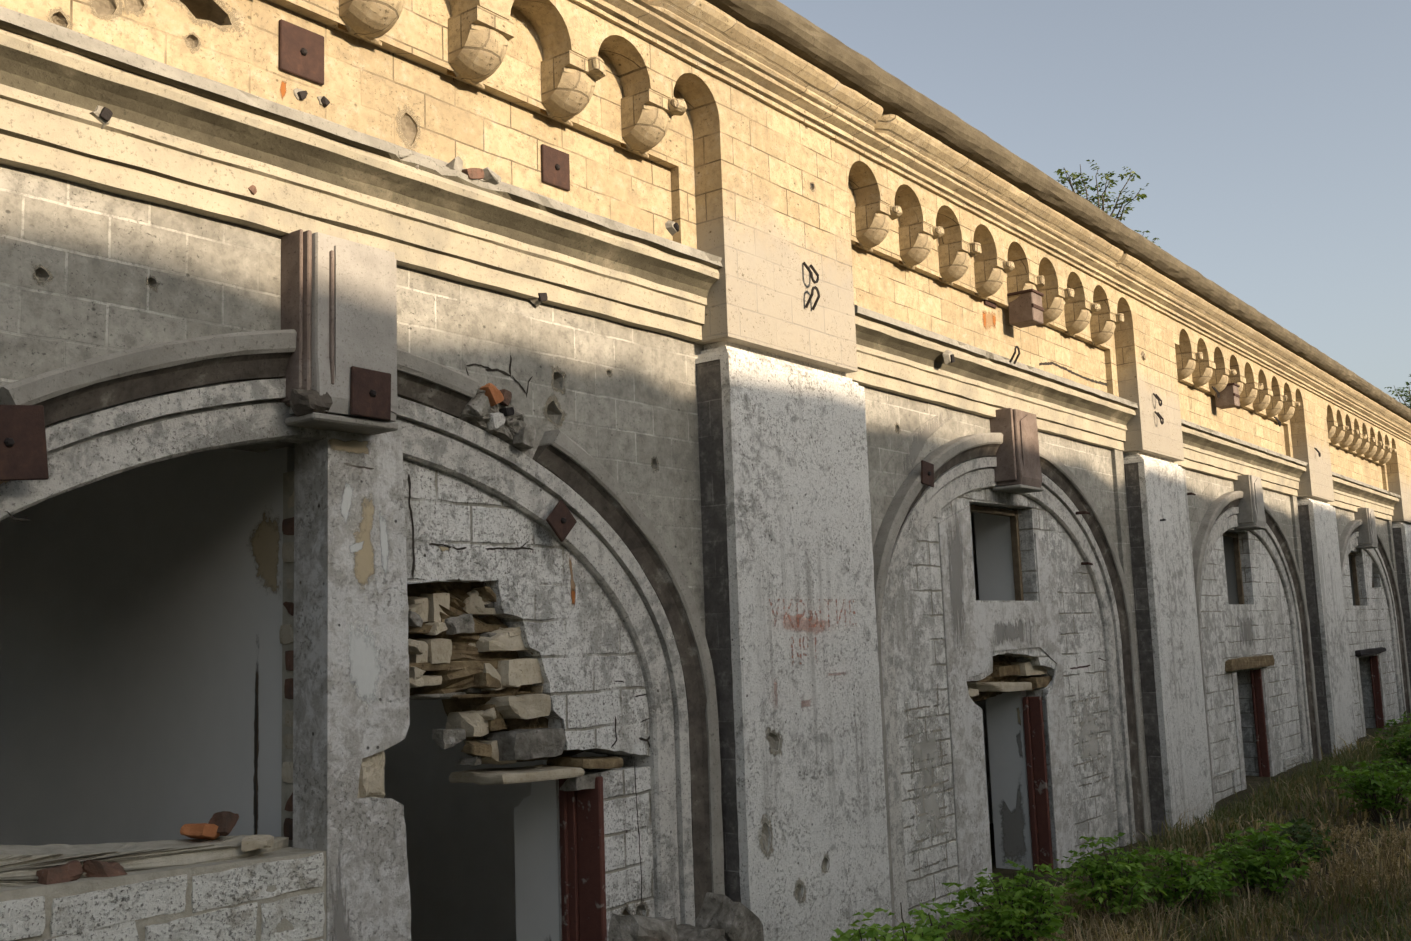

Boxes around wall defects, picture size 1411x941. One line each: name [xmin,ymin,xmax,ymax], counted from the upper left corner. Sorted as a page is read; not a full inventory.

peeling [341,484,389,585]
flaking render [408,587,566,765]